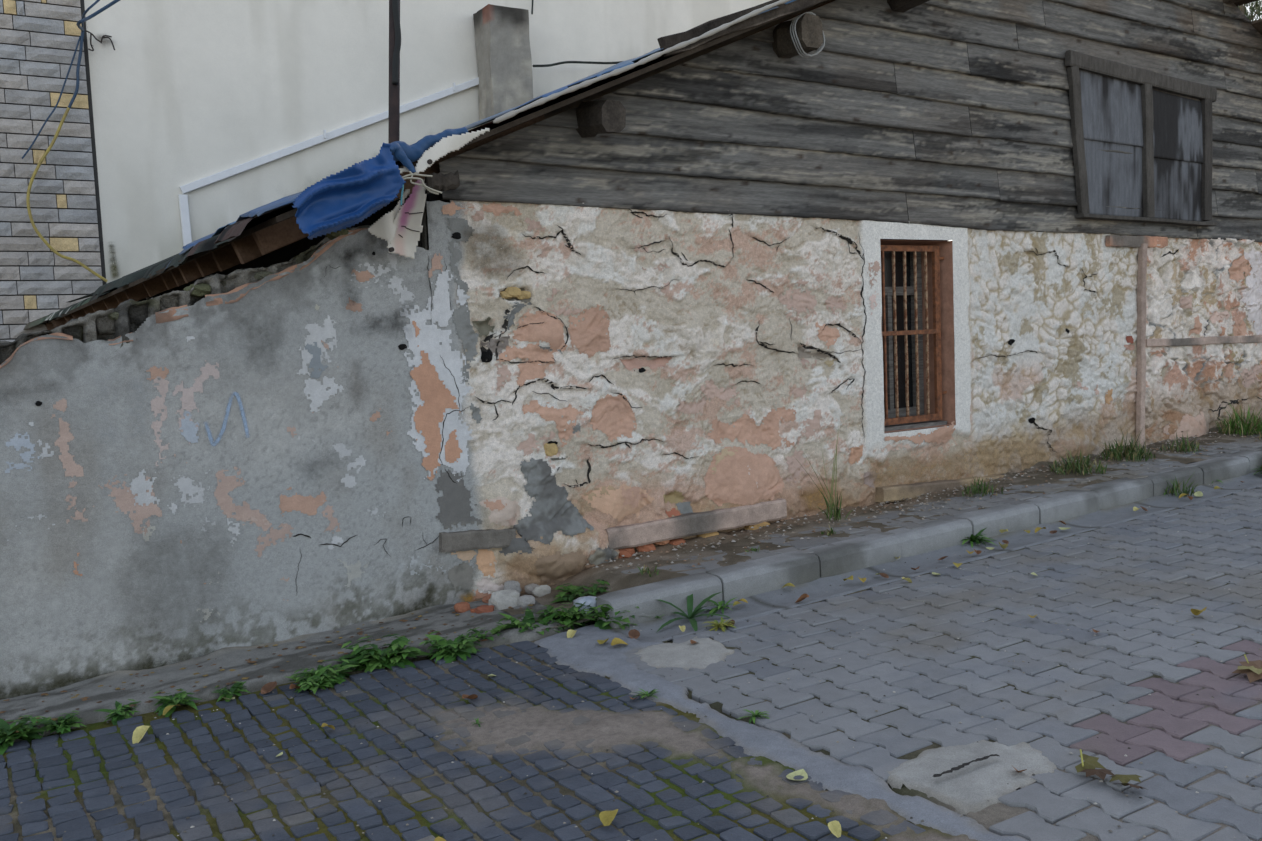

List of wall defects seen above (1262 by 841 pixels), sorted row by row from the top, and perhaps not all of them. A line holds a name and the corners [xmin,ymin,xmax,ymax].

spalling [0,333,73,369]
spalling [155,225,371,323]
peeling [297,304,344,413]
crack [439,225,674,483]
crack [620,209,867,432]
crack [1024,248,1096,292]
peeling [5,398,94,541]
peeling [98,360,369,587]
crack [565,439,695,488]